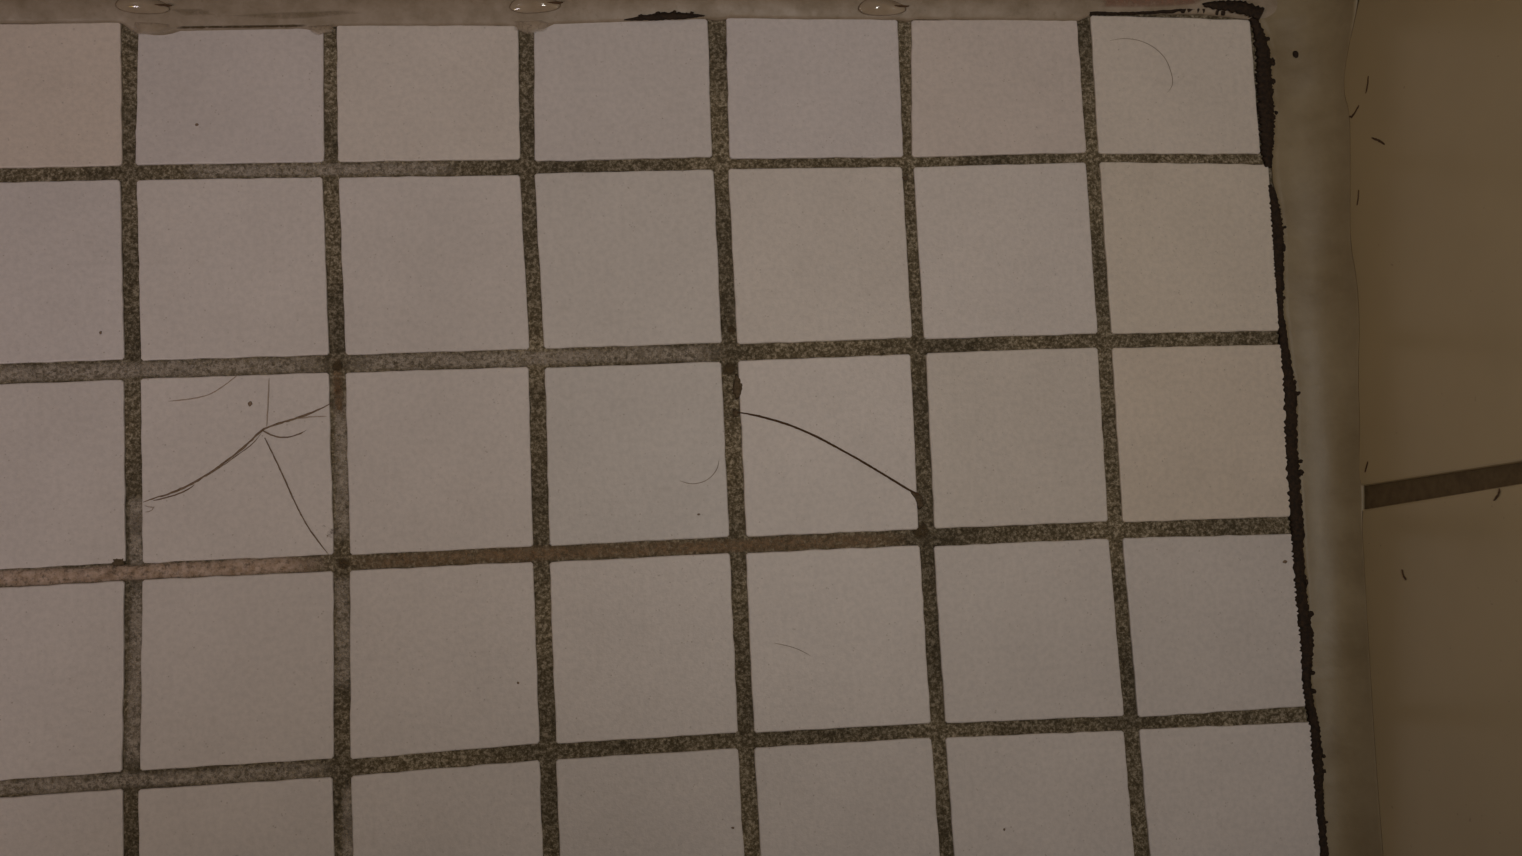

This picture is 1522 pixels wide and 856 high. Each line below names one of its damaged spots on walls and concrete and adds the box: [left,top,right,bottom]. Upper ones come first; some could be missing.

crack [144,376,332,555]
crack [737,412,919,495]